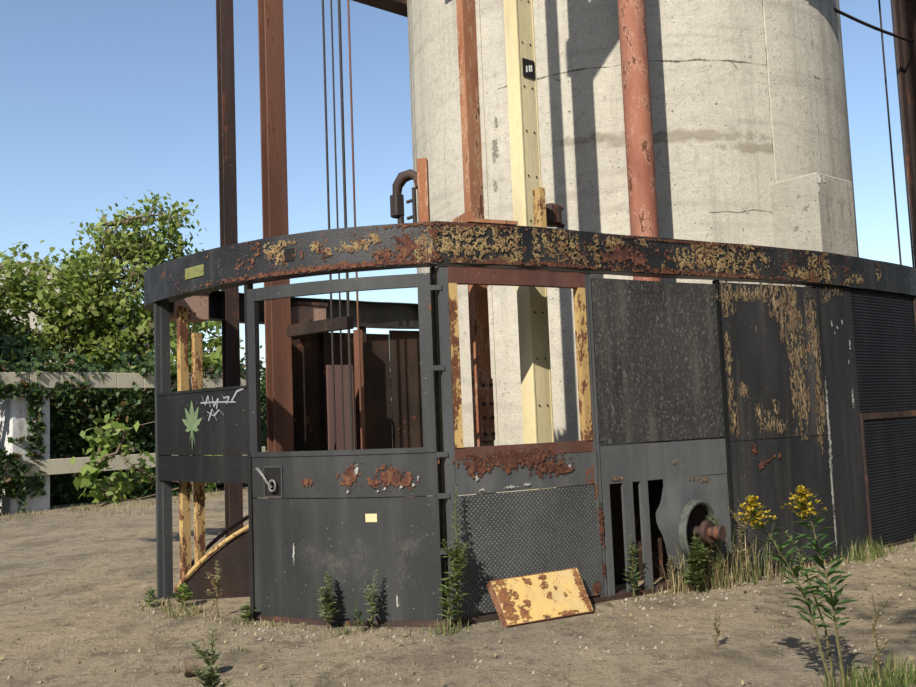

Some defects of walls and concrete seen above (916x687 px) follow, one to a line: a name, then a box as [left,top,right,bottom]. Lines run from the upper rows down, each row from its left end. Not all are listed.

peeling [263,238,296,265]
peeling [310,233,381,255]
peeling [414,221,648,270]
peeling [662,241,864,553]
rust [336,462,419,491]
rust [453,447,578,479]